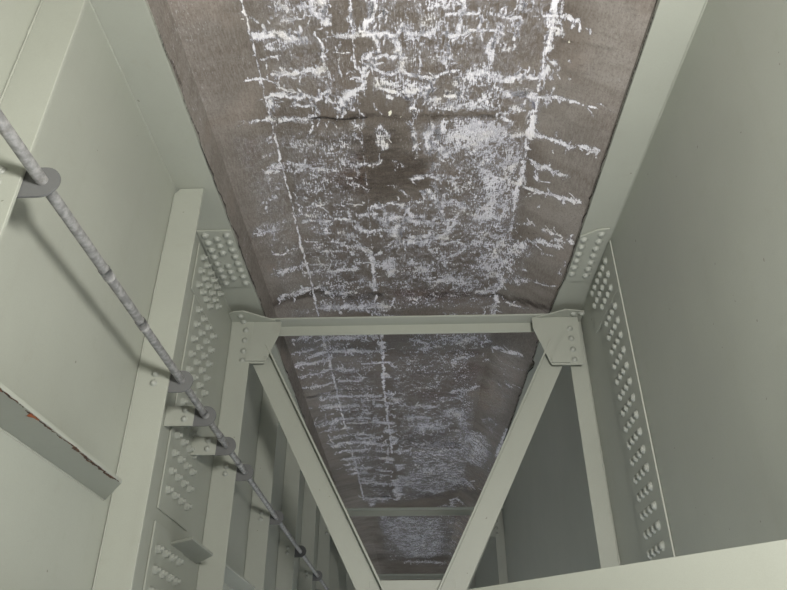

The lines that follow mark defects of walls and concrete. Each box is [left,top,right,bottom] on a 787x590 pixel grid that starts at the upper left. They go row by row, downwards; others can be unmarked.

water stain [253,219,293,263]
crack [160,0,657,317]
water stain [282,0,545,316]
rust [0,388,119,482]
crack [282,335,481,507]
water stain [299,333,497,503]
crack [448,340,539,441]
water stain [380,516,467,564]